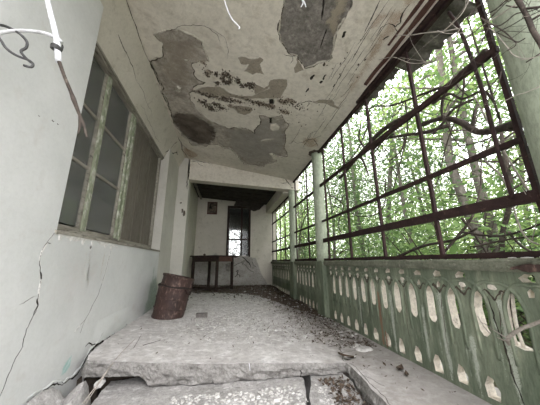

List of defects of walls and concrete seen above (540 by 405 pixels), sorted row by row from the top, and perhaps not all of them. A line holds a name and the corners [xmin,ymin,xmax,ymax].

crack [126,0,166,101]
damp [173,112,218,145]
peeling [150,28,308,166]
peeling [277,0,353,73]
crack [289,0,410,147]
crack [1,235,53,393]
crack [27,251,136,402]
crack [488,298,524,404]